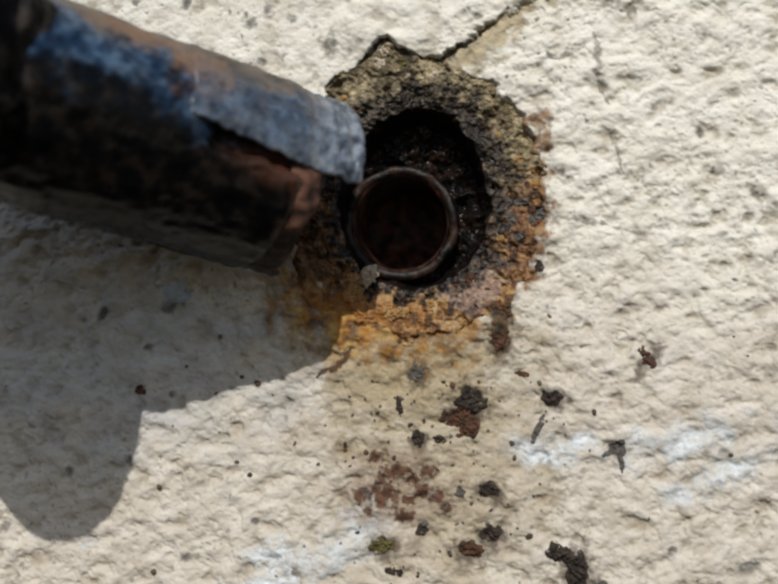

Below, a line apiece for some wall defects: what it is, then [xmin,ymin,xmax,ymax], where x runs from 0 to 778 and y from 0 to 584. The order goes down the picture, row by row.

crack [605,0,658,11]
corrosion [248,160,514,439]
spalling [292,2,547,347]
corrosion [410,429,447,452]